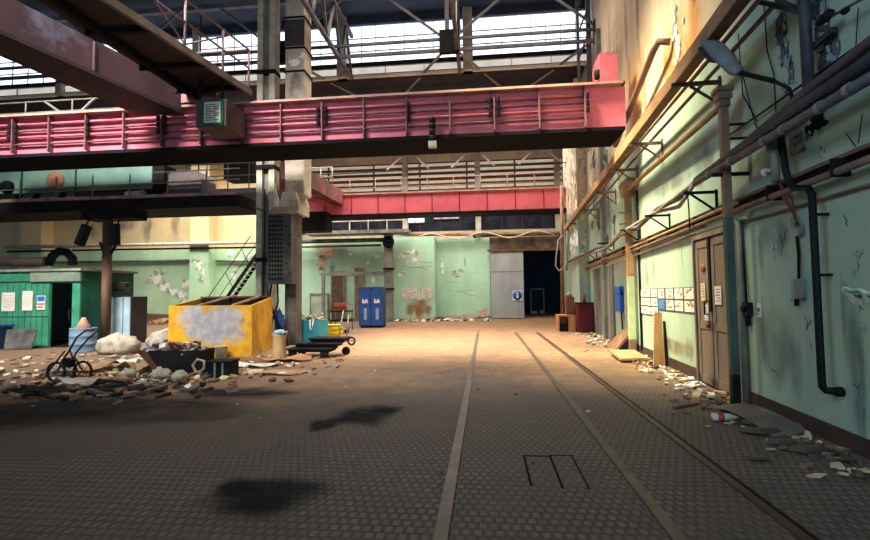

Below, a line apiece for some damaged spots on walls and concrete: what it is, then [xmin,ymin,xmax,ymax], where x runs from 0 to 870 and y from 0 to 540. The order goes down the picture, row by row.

spalling [771,9,794,97]
spalling [811,0,841,78]
peeling [145,257,205,303]
peeling [315,247,336,275]
peeling [397,249,420,277]